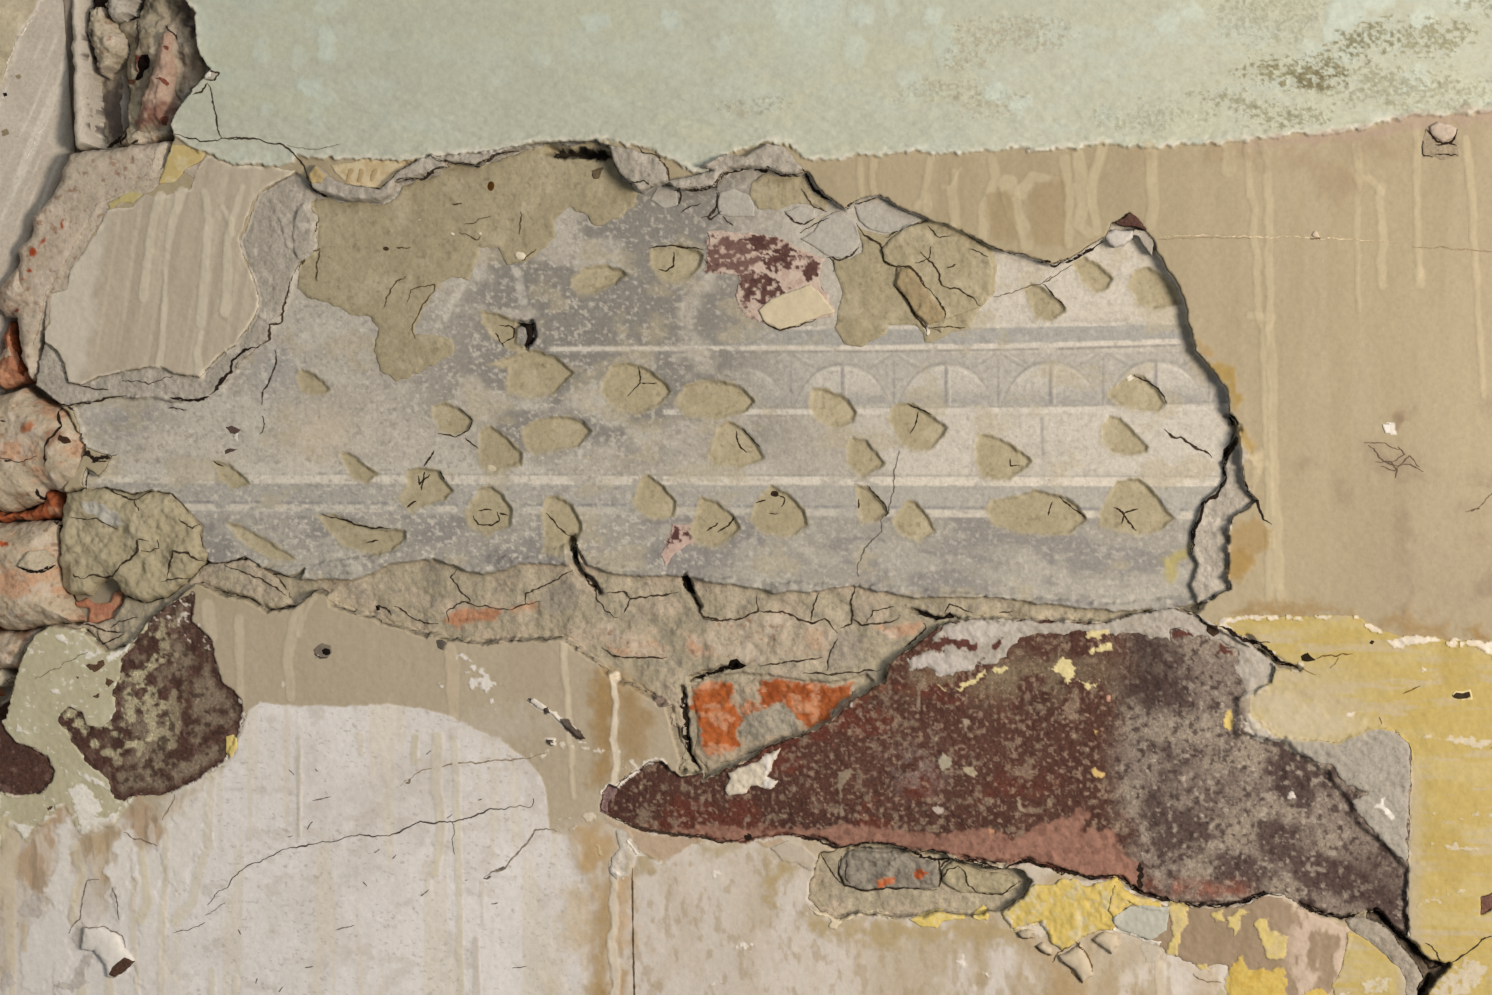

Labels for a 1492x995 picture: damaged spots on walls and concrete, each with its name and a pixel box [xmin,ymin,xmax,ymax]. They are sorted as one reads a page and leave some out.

spalling [117,0,220,146]
damp [912,0,1492,617]
flaking render [36,140,1272,613]
peeling [1382,407,1414,437]
crack [400,753,546,786]
crack [680,664,738,767]
peeling [261,545,1492,995]
crack [173,798,557,933]
peeling [70,920,135,978]